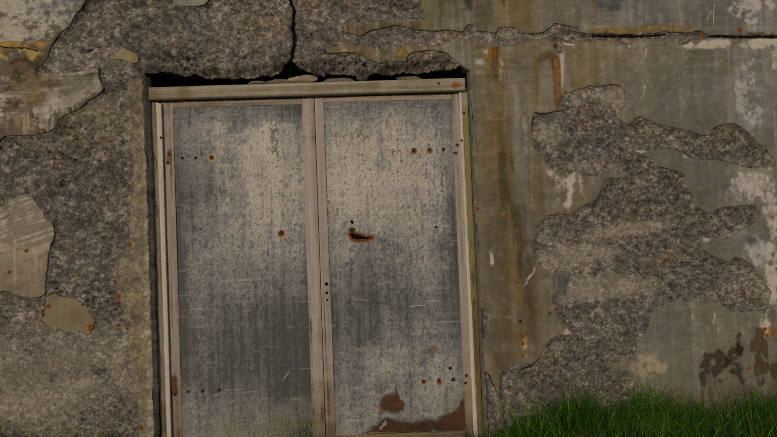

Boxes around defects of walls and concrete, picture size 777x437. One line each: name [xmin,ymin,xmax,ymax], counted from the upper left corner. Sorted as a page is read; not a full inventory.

crack [287,0,296,78]
corrosion [537,52,561,105]
spalling [364,24,757,53]
crack [591,31,665,39]
efflorescence [681,0,777,136]
crack [710,33,777,41]
spalling [0,0,426,437]
spalling [485,84,776,437]
leakage [699,167,777,386]
corrosion [372,394,465,433]